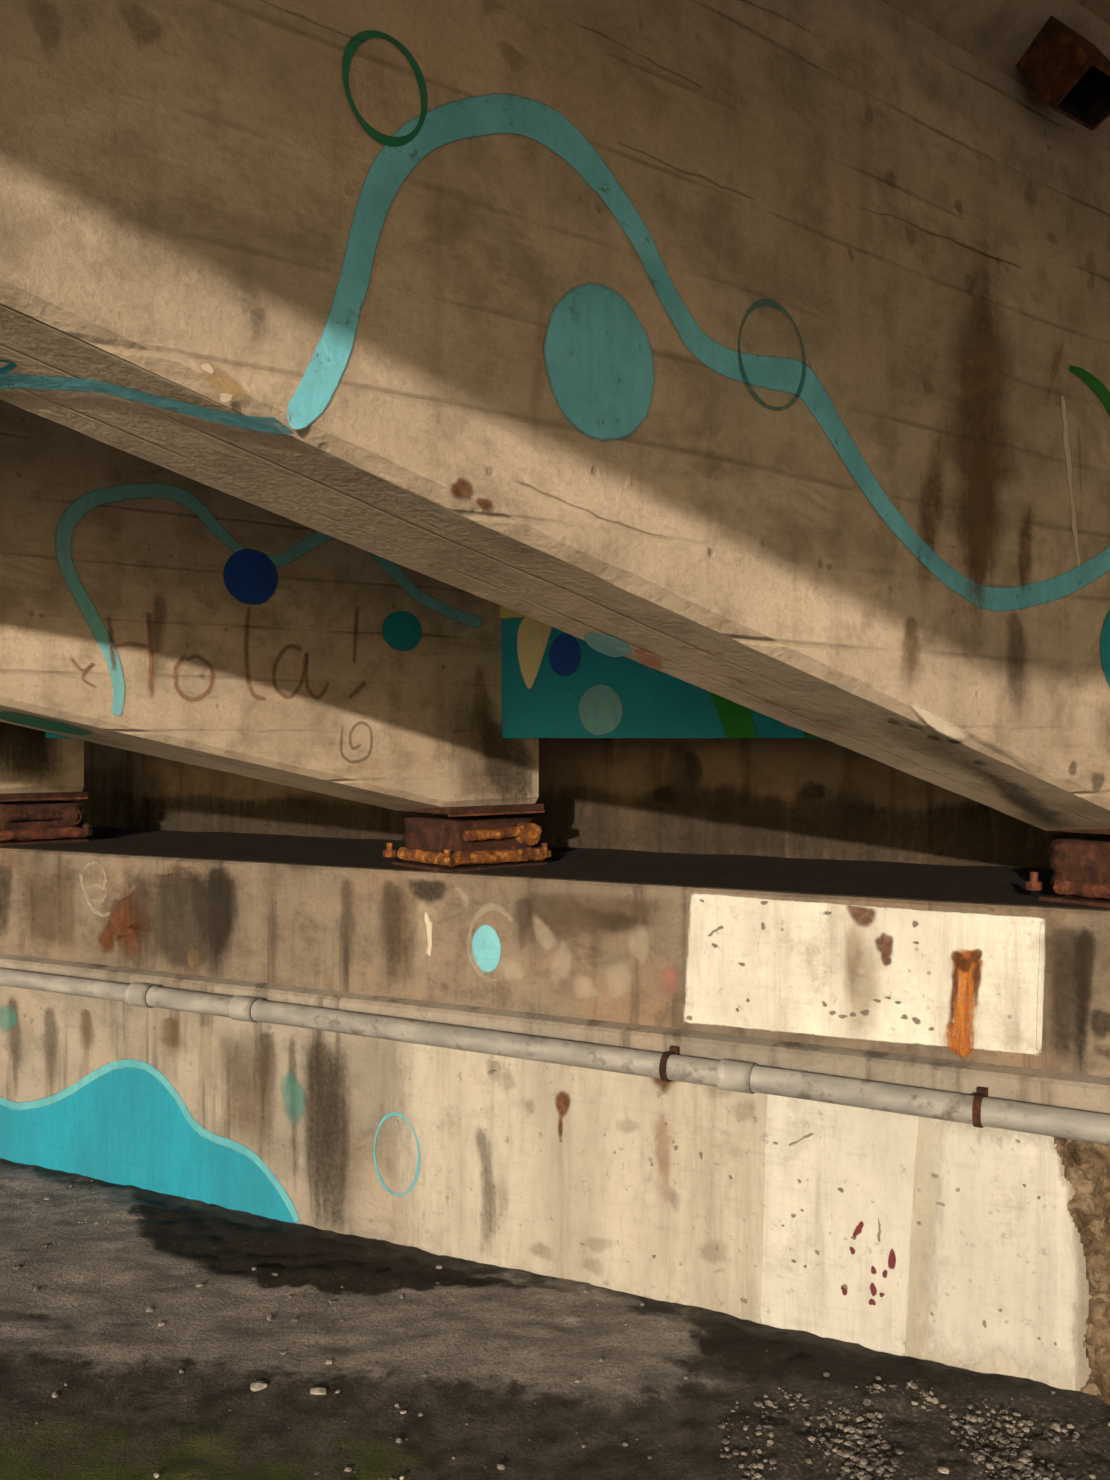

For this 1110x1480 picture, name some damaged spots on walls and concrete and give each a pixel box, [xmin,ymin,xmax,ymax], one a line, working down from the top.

water stain [921,276,1008,589]
water stain [1020,513,1031,586]
water stain [888,720,961,744]
water stain [0,772,445,840]
water stain [490,730,1103,868]
corrosion [100,895,144,954]
water stain [136,869,232,964]
corrosion [848,906,893,965]
corrosion [947,949,982,1056]
water stain [308,1064,346,1215]
corrosion [556,1092,570,1137]
spalling [1054,1137,1110,1405]